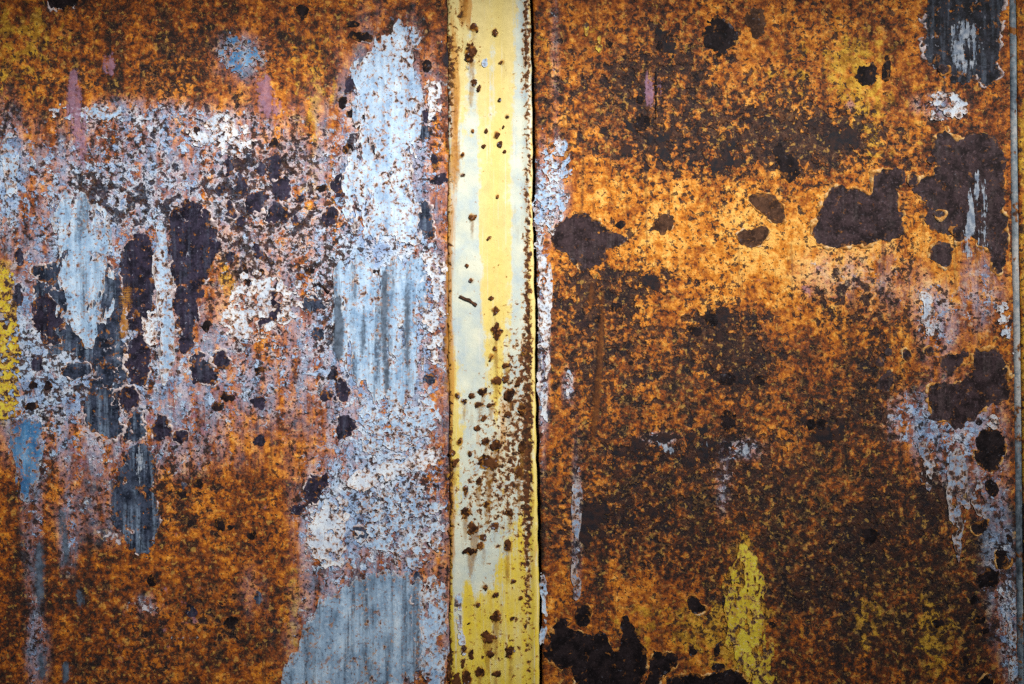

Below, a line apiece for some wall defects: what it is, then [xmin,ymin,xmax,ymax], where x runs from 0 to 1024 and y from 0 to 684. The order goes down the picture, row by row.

rust [463,0,478,62]
rust [471,115,509,153]
rust [599,115,756,181]
peeling [810,0,1010,277]
peeling [0,18,466,684]
rust [444,266,527,555]
peeling [532,135,628,442]
rust [608,423,736,483]
peeling [875,291,1015,562]
rust [447,584,516,684]
peeling [539,484,777,684]
peeling [970,534,1018,684]